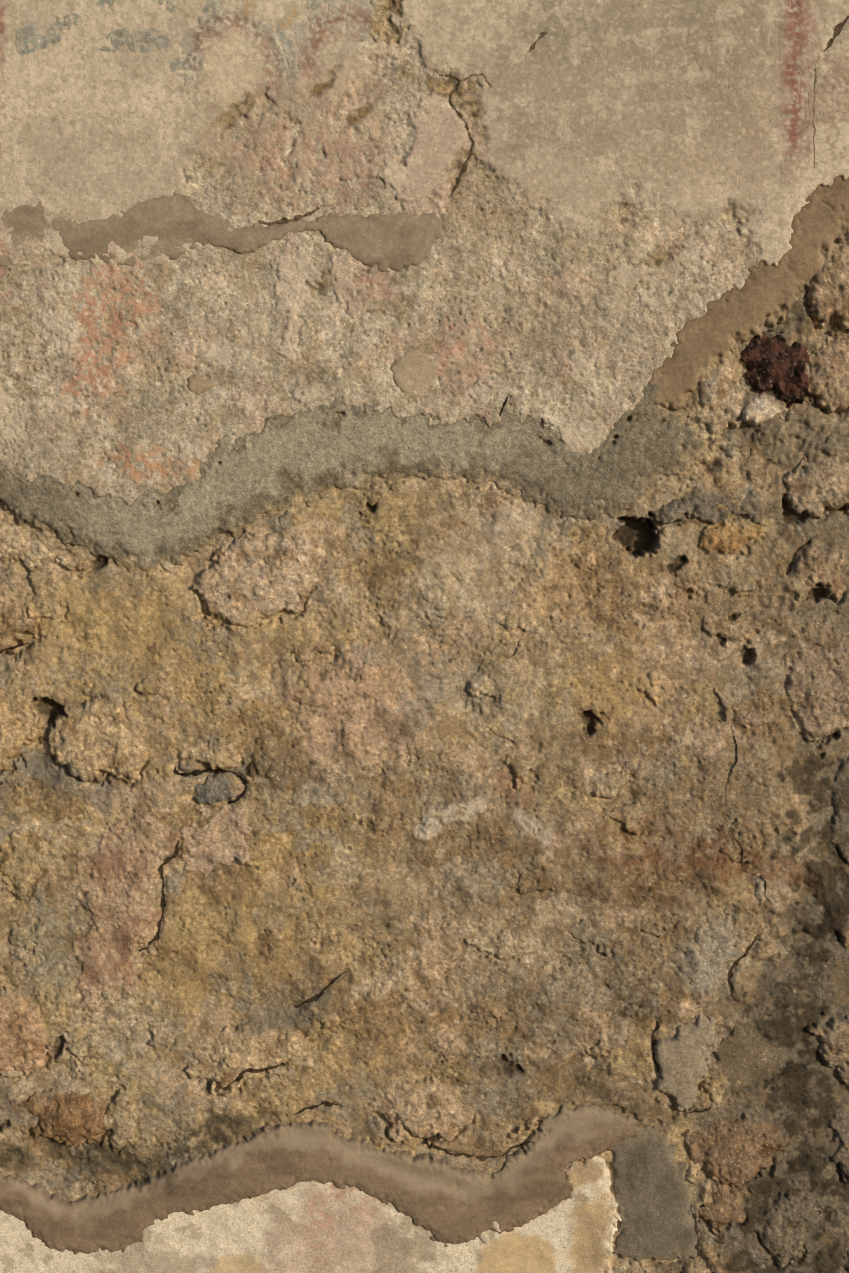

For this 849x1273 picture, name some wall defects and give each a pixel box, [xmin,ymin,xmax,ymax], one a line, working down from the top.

crack [812,16,849,167]
peeling [292,779,350,810]
peeling [67,797,255,1013]
crack [139,840,185,952]
crack [728,935,758,1001]